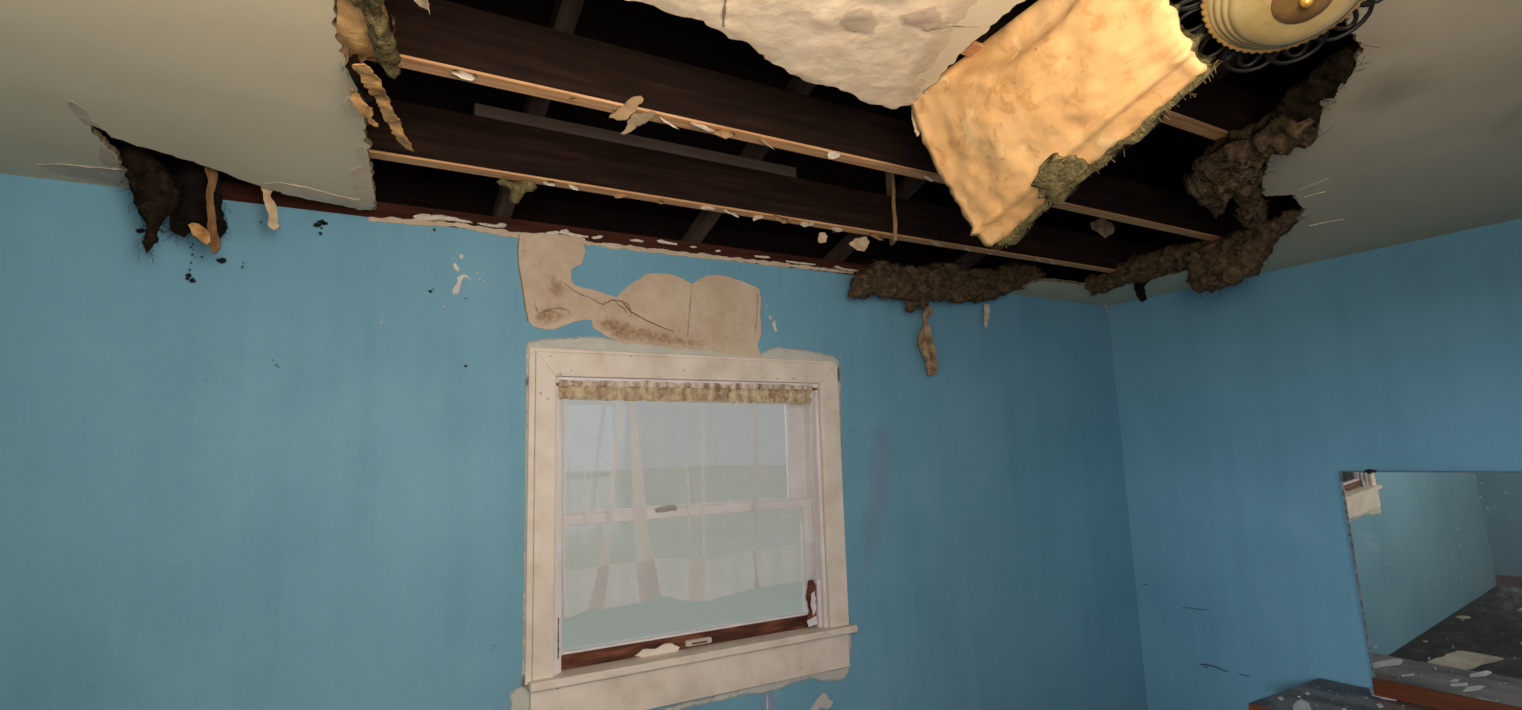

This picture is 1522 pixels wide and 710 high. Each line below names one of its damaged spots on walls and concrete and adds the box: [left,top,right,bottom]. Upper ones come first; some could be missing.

peeling [841,10,877,33]
peeling [902,7,940,31]
peeling [356,208,857,358]
peeling [811,693,833,710]